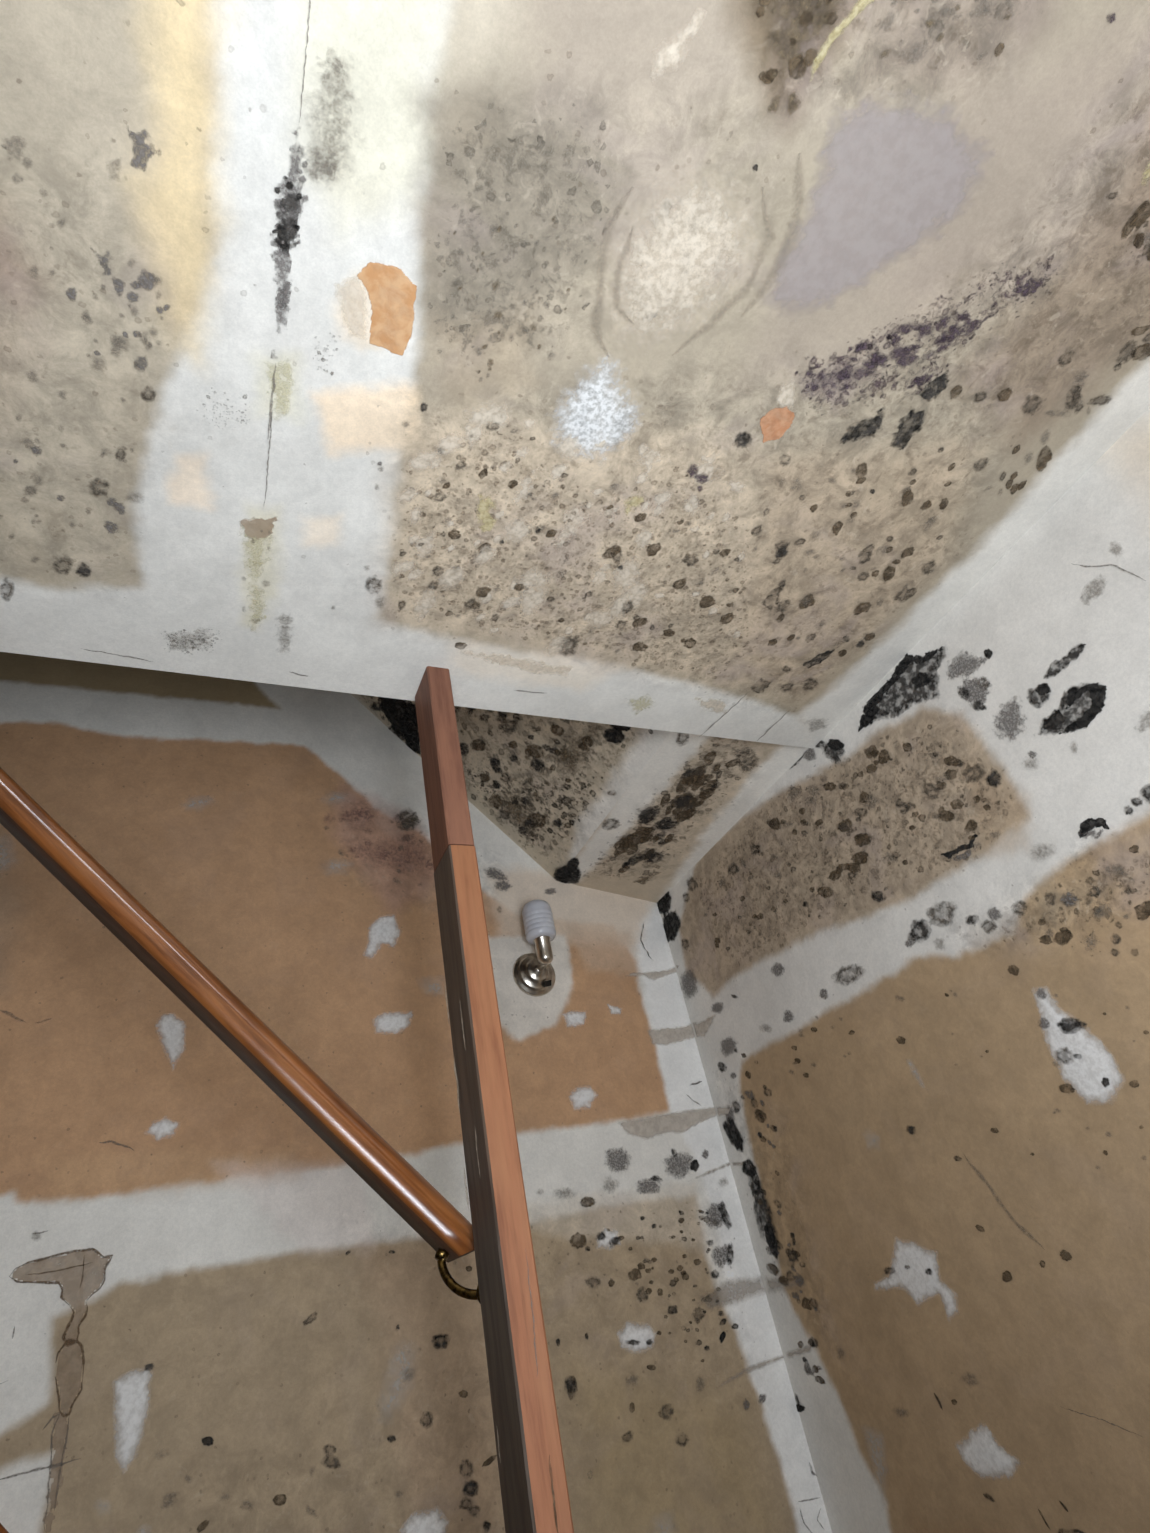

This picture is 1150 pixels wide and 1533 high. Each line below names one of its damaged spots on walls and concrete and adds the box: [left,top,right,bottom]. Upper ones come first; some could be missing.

crack [300,0,311,116]
peeling [339,262,417,355]
damp [795,255,1054,450]
crack [264,406,273,503]
damp [394,365,750,678]
damp [751,581,875,693]
damp [366,695,421,754]
damp [455,706,653,849]
damp [600,733,758,884]
damp [545,857,581,895]
damp [905,869,1150,956]
crack [0,1458,81,1480]